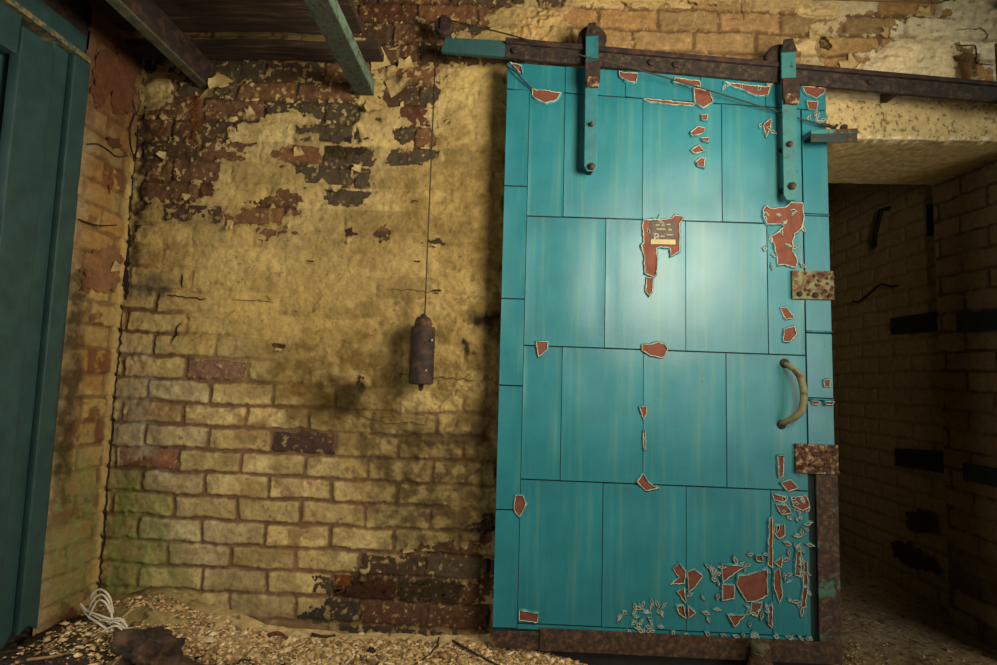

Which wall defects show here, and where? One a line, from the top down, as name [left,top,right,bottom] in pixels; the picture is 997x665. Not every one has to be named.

peeling [951,42,995,81]
crack [955,28,993,65]
peeling [107,0,953,243]
corrosion [804,271,835,298]
peeling [297,513,495,636]